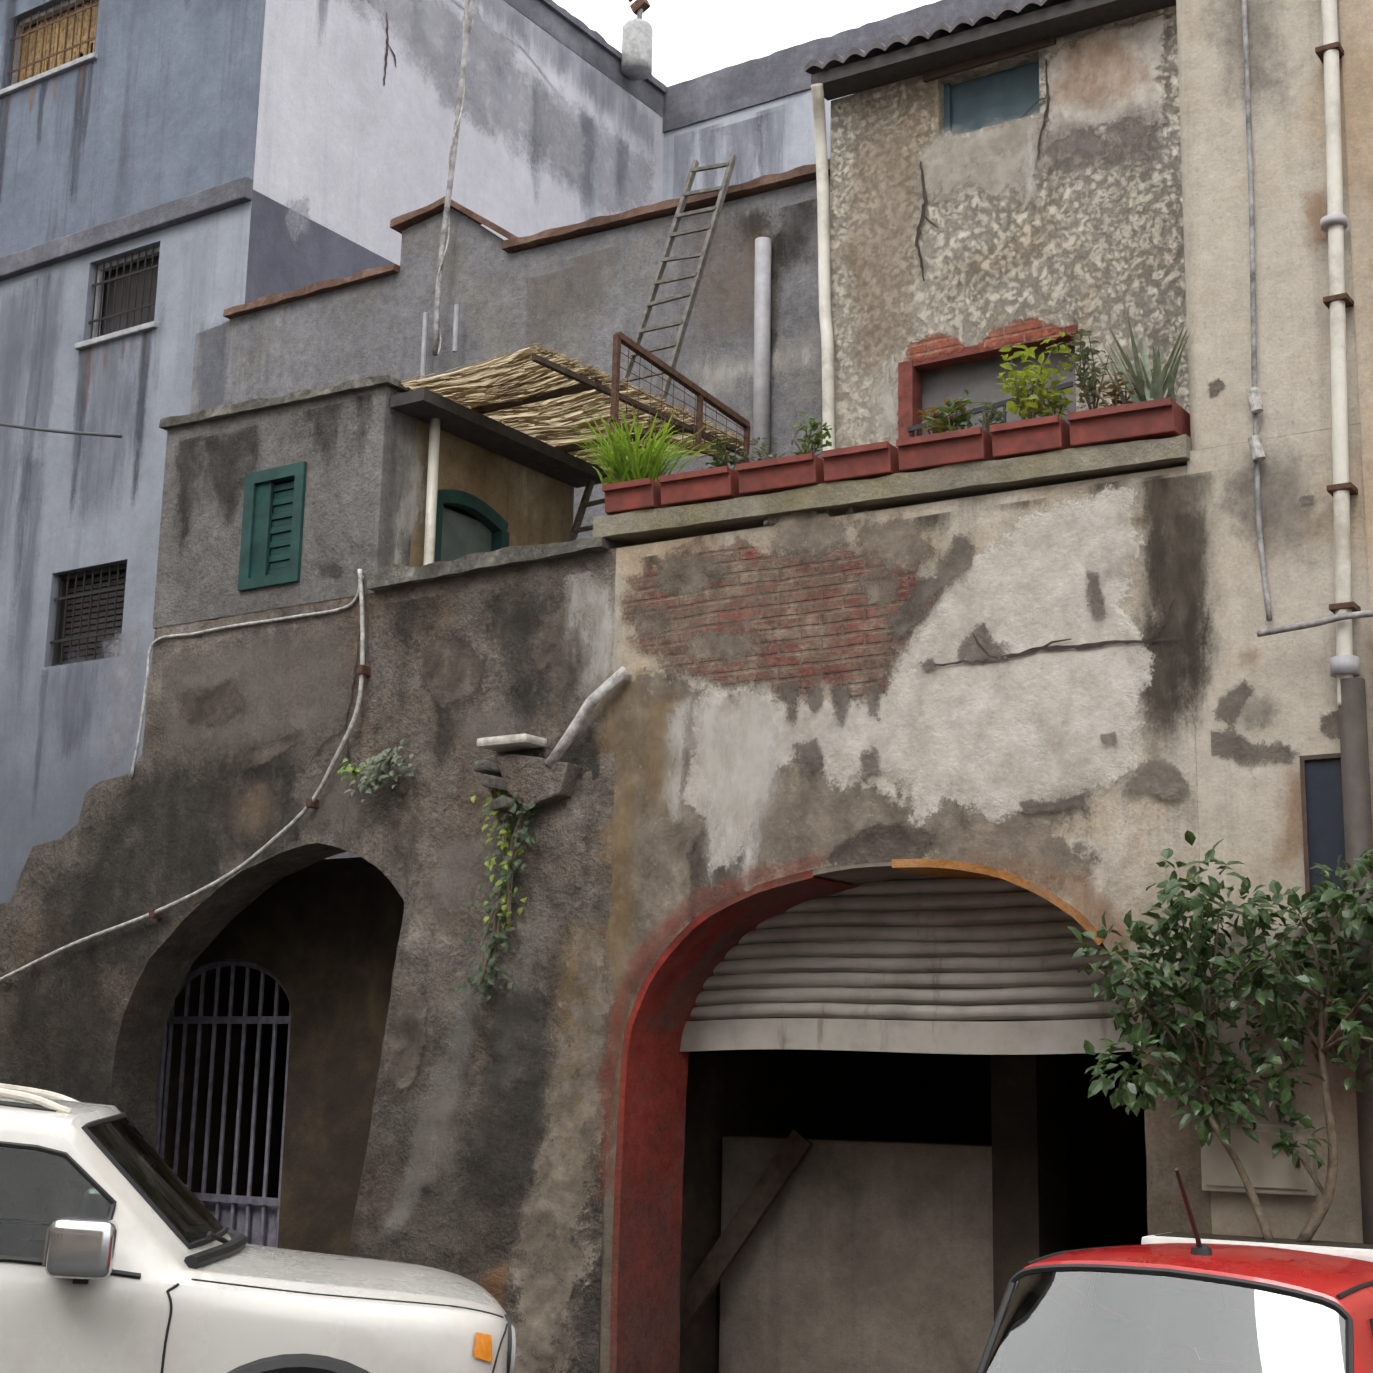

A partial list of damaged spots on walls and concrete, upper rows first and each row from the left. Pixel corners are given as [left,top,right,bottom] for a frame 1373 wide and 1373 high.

damp [0,0,16,195]
crack [383,12,396,86]
crack [1021,59,1050,169]
crack [914,161,939,281]
flaking render [904,316,1074,362]
damp [73,347,91,494]
damp [133,331,150,493]
damp [176,425,258,538]
crack [935,600,1184,666]
flaking render [1086,571,1105,620]
damp [1139,472,1211,733]
flaking render [503,507,1101,1373]